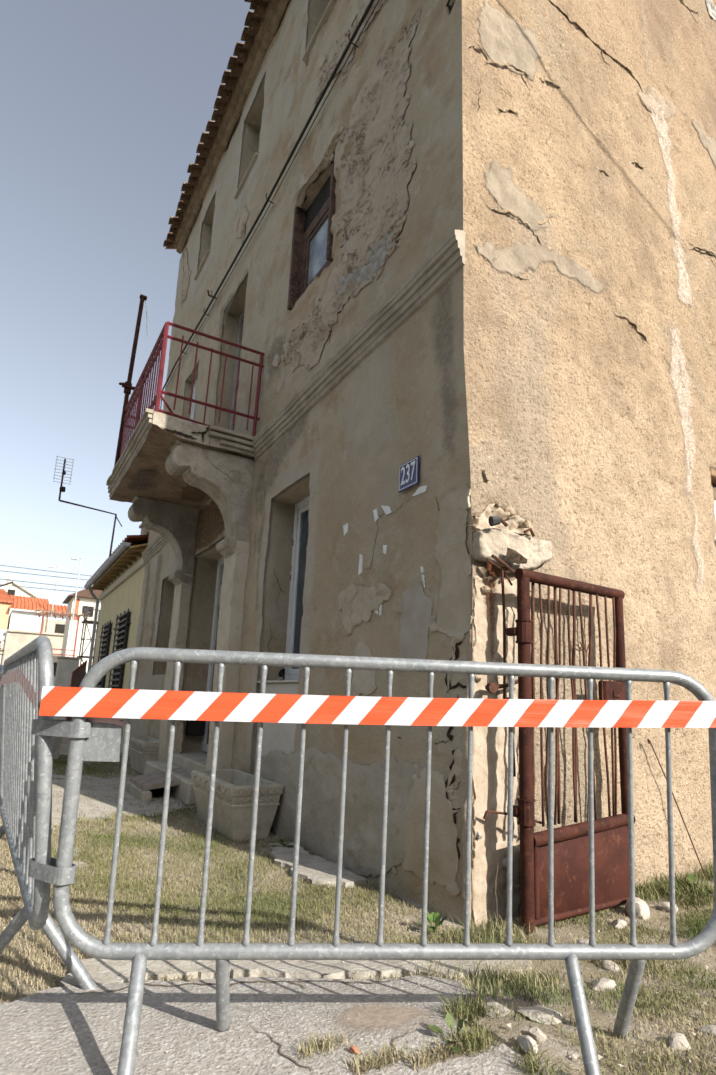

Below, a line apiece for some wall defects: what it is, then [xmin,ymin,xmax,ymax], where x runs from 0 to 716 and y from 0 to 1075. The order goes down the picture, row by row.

crack [471,58,530,117]
flaking render [469,0,560,88]
crack [549,0,646,94]
crack [680,0,699,23]
flaking render [272,0,420,372]
crack [494,204,553,245]
flaking render [474,160,603,293]
water stain [648,98,692,305]
crack [688,241,716,263]
crack [614,309,649,347]
flaking render [338,554,392,635]
flaking render [429,484,534,663]